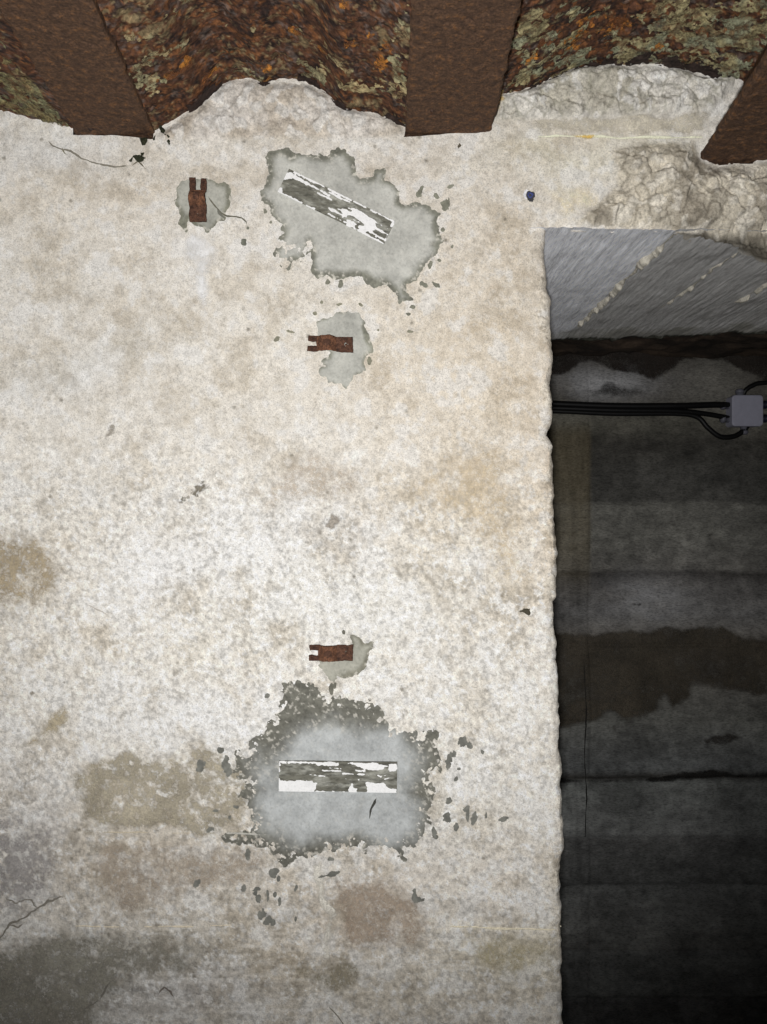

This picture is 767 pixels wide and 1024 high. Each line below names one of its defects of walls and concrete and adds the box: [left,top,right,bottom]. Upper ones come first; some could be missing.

crack [49,142,145,168]
peeling [174,178,231,233]
peeling [260,147,454,389]
leakage [552,352,693,379]
leakage [555,627,767,728]
leakage [75,749,245,835]
peeling [206,630,509,926]
leakage [648,770,767,782]
crack [0,896,65,938]